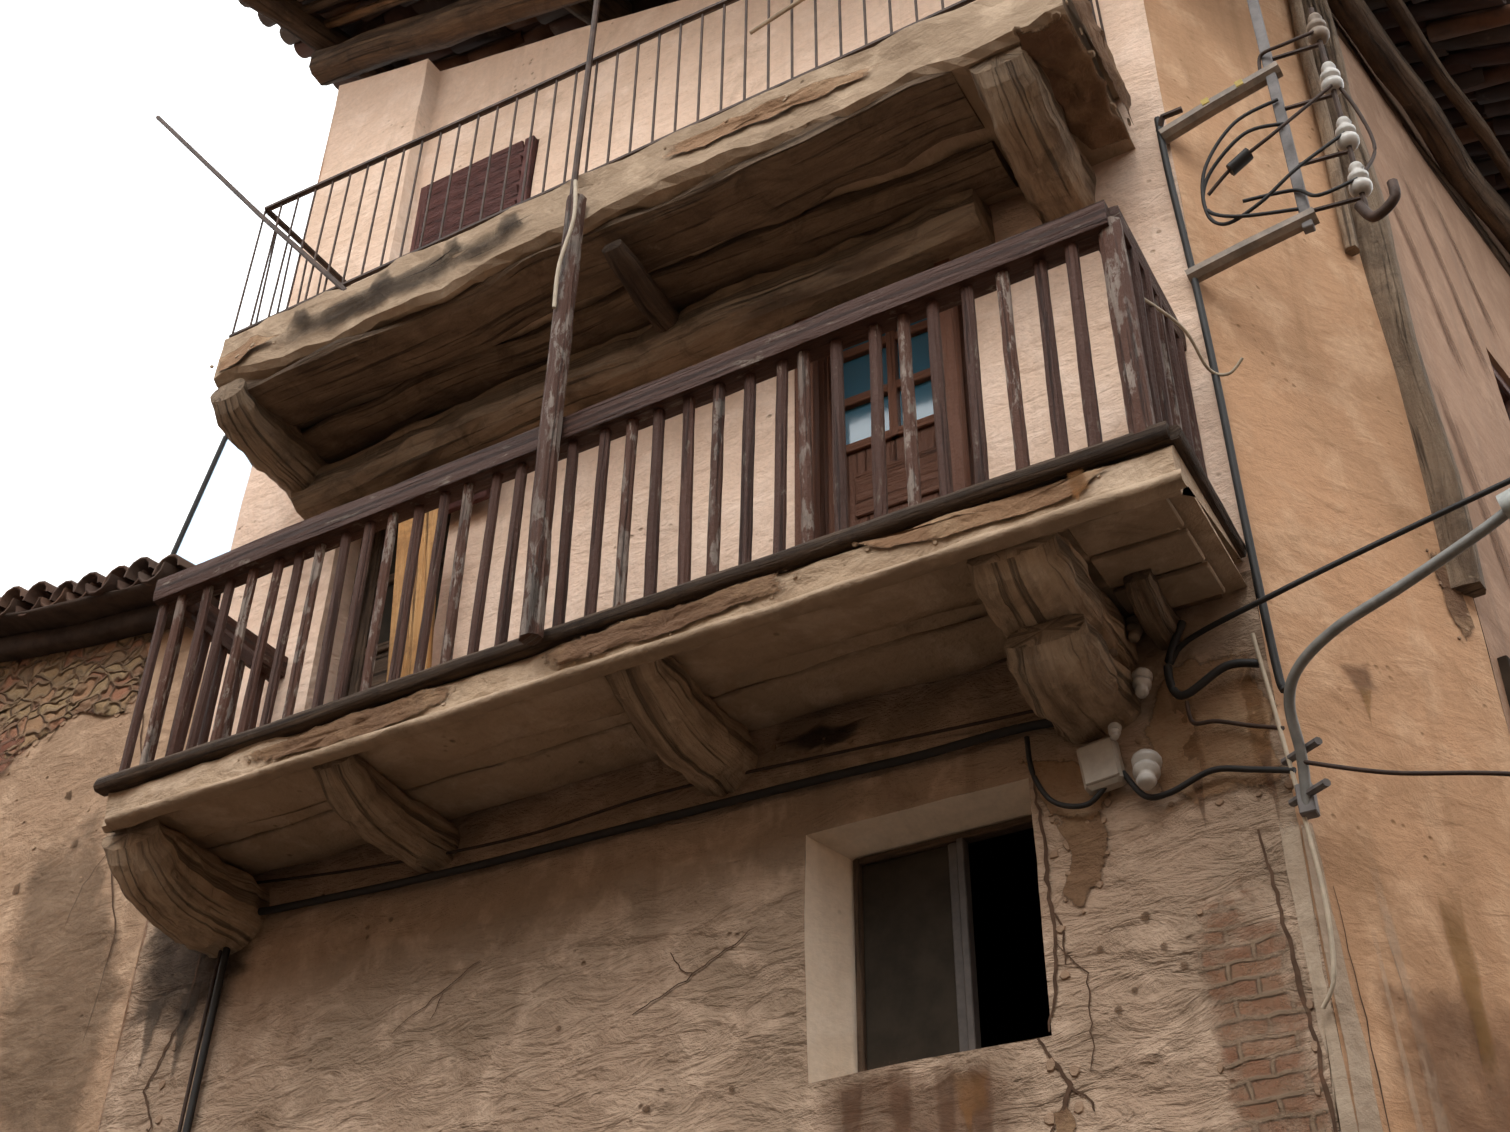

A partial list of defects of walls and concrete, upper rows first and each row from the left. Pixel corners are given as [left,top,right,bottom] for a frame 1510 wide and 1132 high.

leakage [498,213,520,232]
leakage [291,309,309,326]
spalling [1018,758,1112,914]
leakage [138,928,242,1075]
crack [632,926,757,1015]
crack [1031,776,1095,1132]
flaking render [1180,823,1390,1132]